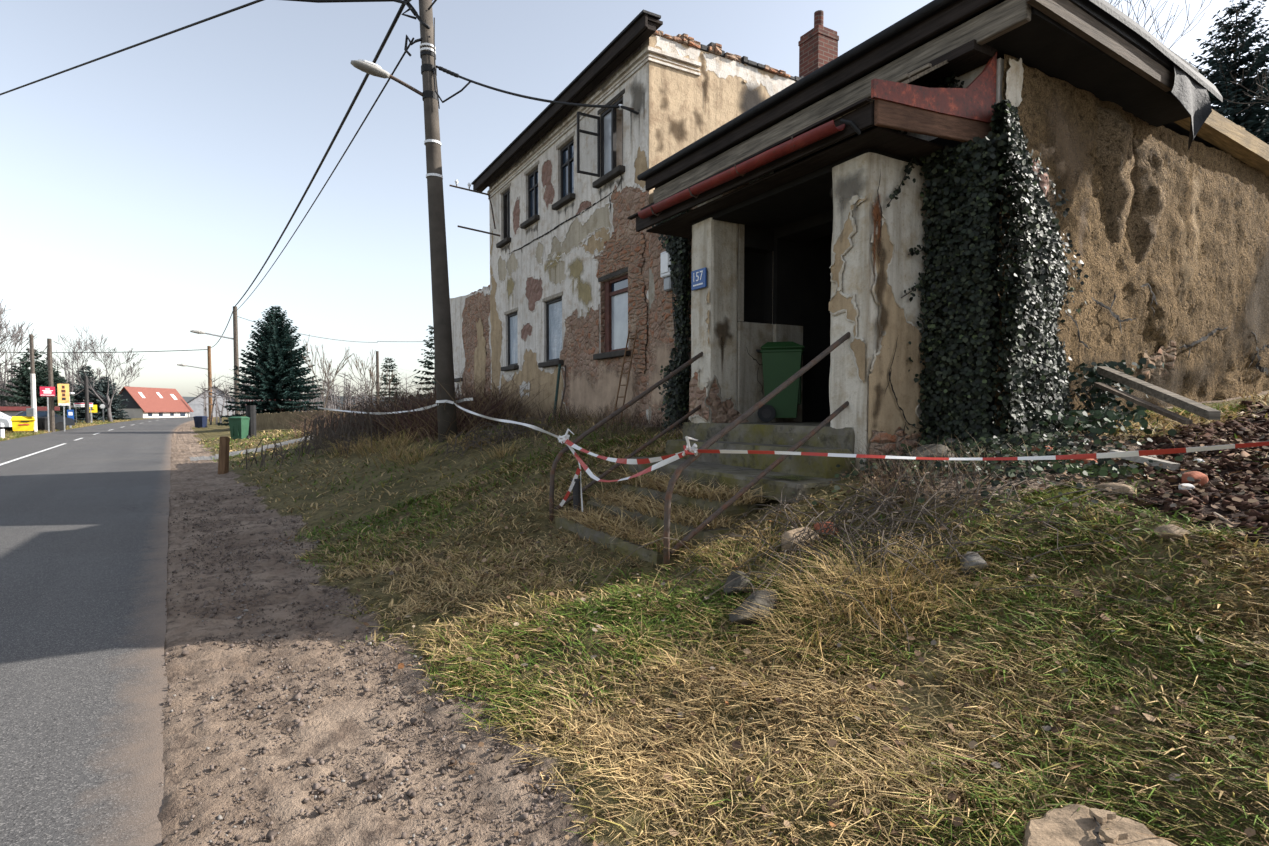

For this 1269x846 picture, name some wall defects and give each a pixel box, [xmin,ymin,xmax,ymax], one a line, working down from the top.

water stain [658,114,702,149]
flaking render [461,142,750,424]
flaking render [829,195,930,465]
crack [885,335,920,433]